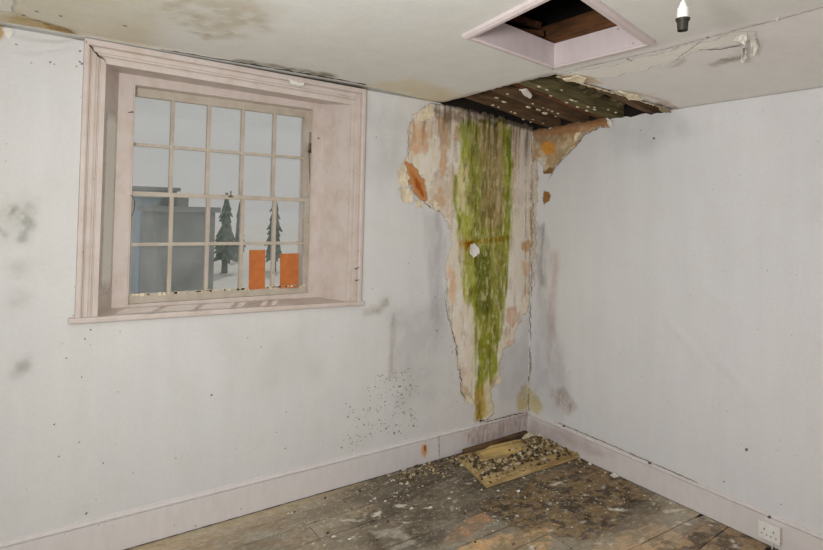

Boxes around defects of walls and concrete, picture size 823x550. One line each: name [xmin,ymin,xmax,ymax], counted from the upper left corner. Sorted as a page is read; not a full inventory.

crack [552,7,823,73]
peeling [398,103,614,422]
leakage [341,368,419,451]